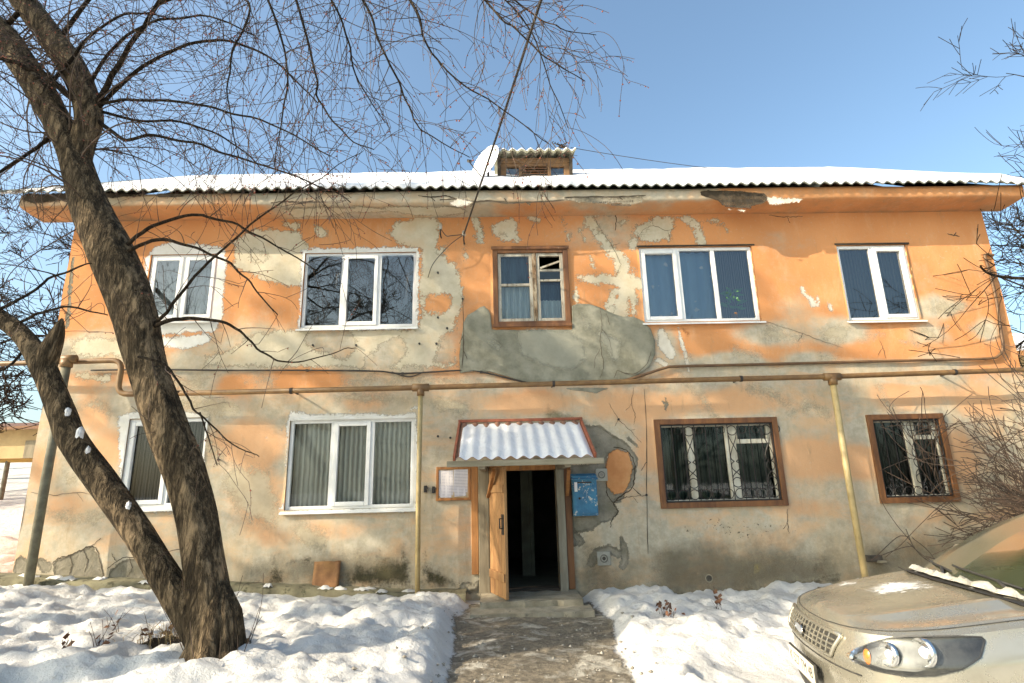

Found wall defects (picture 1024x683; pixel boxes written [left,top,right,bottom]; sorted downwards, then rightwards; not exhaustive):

flaking render [700,190,802,212]
peeling [561,196,728,317]
peeling [162,198,541,403]
peeling [799,286,833,311]
peeling [655,327,690,372]
flaking render [570,425,638,570]
flaking render [13,546,145,578]
leakage [352,563,408,585]
leakage [423,569,446,585]